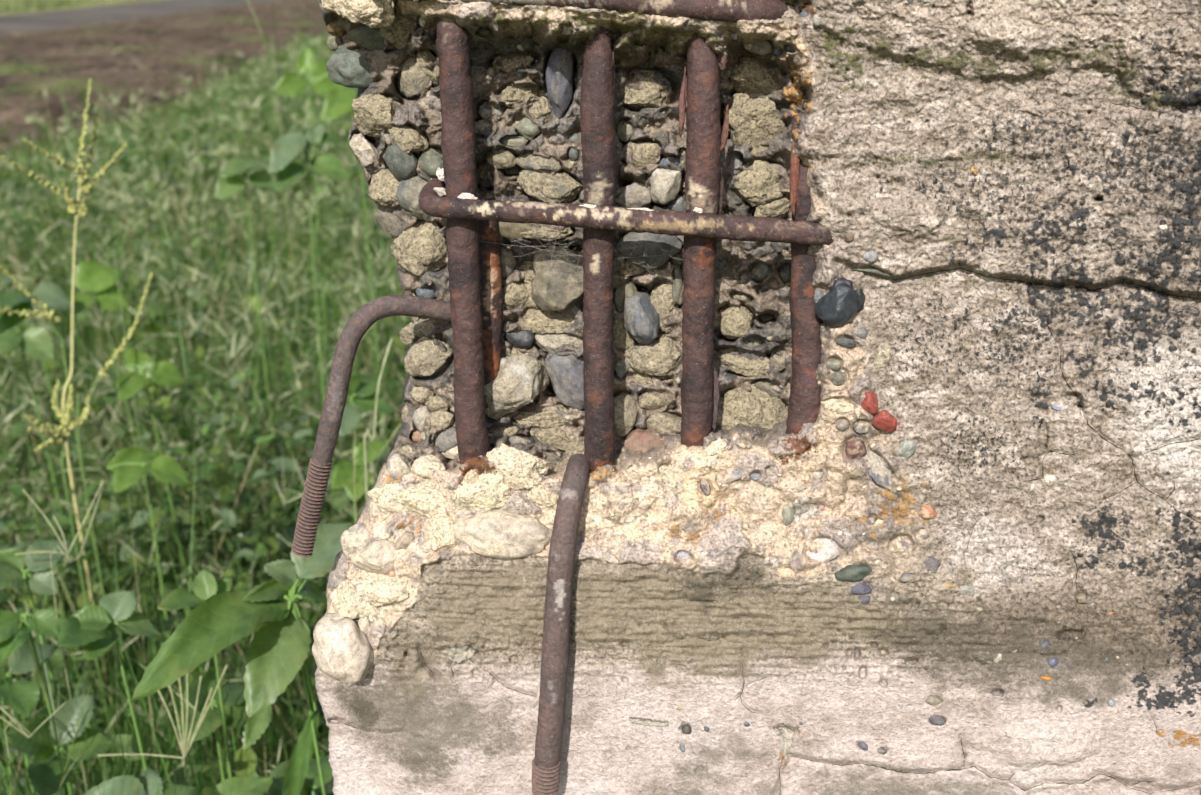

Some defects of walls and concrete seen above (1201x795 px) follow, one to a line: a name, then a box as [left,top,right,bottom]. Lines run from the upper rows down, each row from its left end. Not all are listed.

spalling [318,0,829,302]
corrosion [678,67,687,137]
corrosion [717,105,729,214]
corrosion [783,59,812,217]
corrosion [391,515,423,534]
spalling [312,222,585,684]
corrosion [452,455,495,486]
corrosion [589,466,617,481]
spalling [575,230,937,594]
corrosion [777,432,821,465]
crack [895,262,1201,523]
crack [779,740,1199,795]